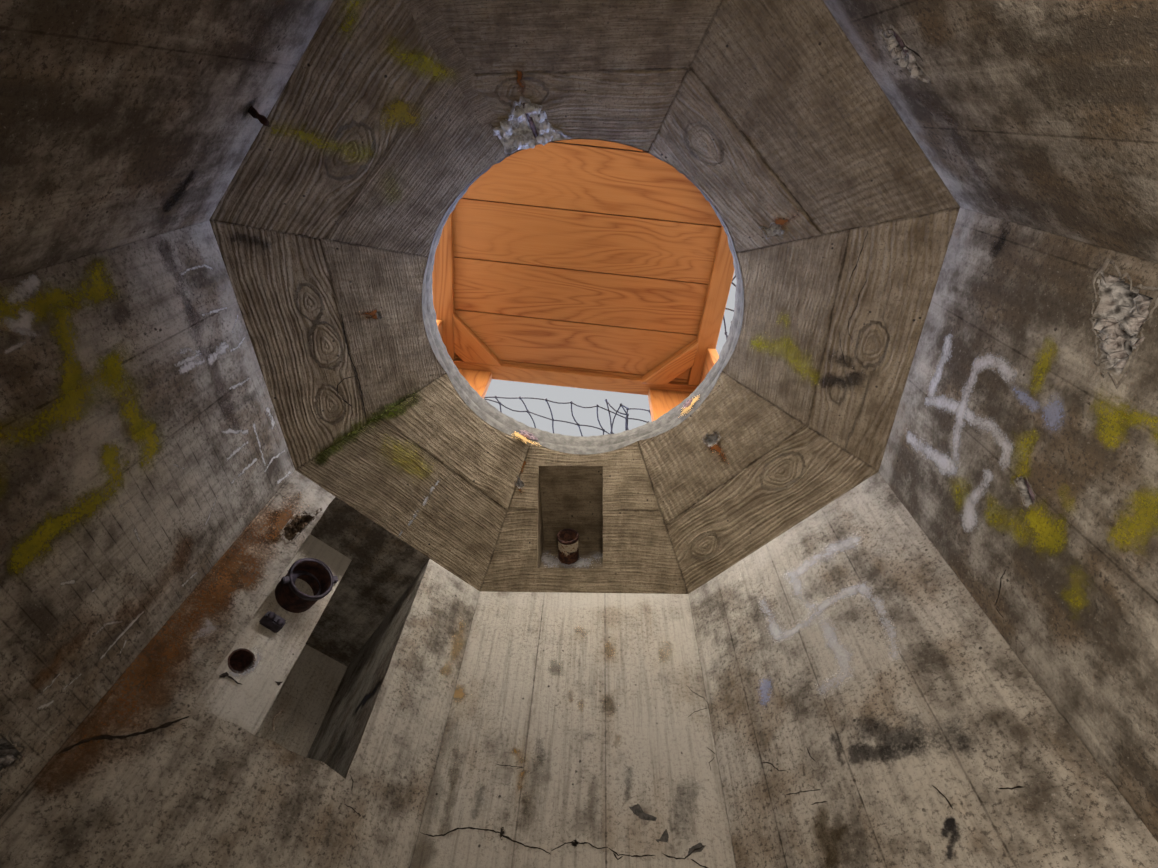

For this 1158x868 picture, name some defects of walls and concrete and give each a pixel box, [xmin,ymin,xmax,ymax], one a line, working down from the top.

spalling [493,70,574,154]
spalling [1090,258,1158,389]
rust [35,493,309,796]
spalling [0,729,26,780]
crack [57,716,189,755]
crack [420,827,708,868]